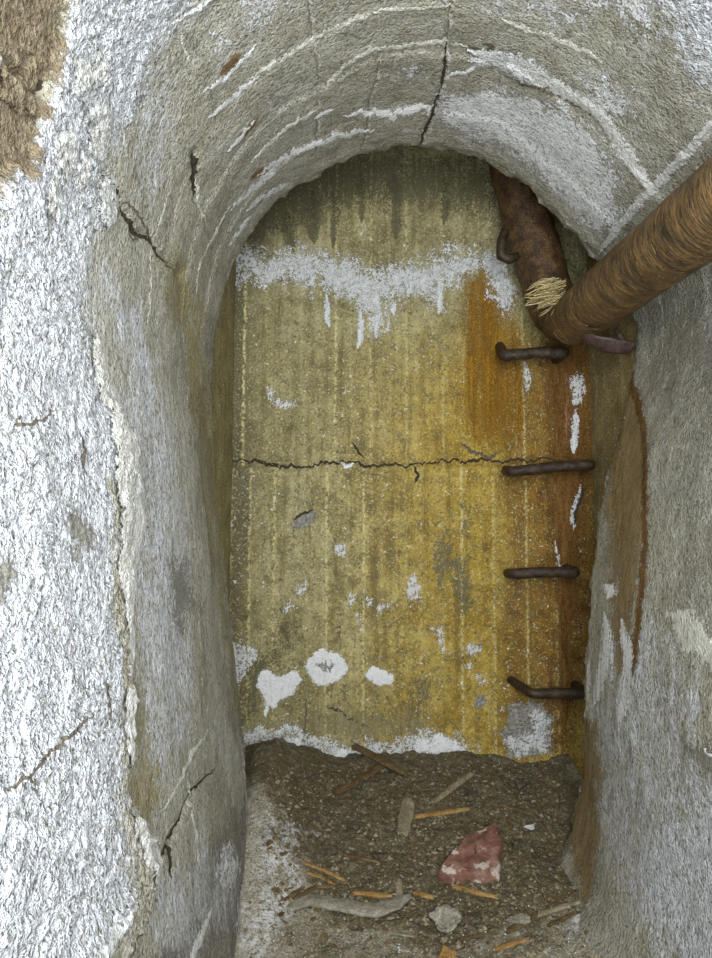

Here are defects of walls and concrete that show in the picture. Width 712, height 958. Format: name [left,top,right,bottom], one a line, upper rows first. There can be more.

spalling [0,0,119,231]
crack [101,175,176,277]
crack [419,0,456,145]
leakage [227,43,712,349]
corrosion [451,269,530,459]
crack [233,442,589,483]
corrosion [536,336,652,904]
crack [161,766,216,879]